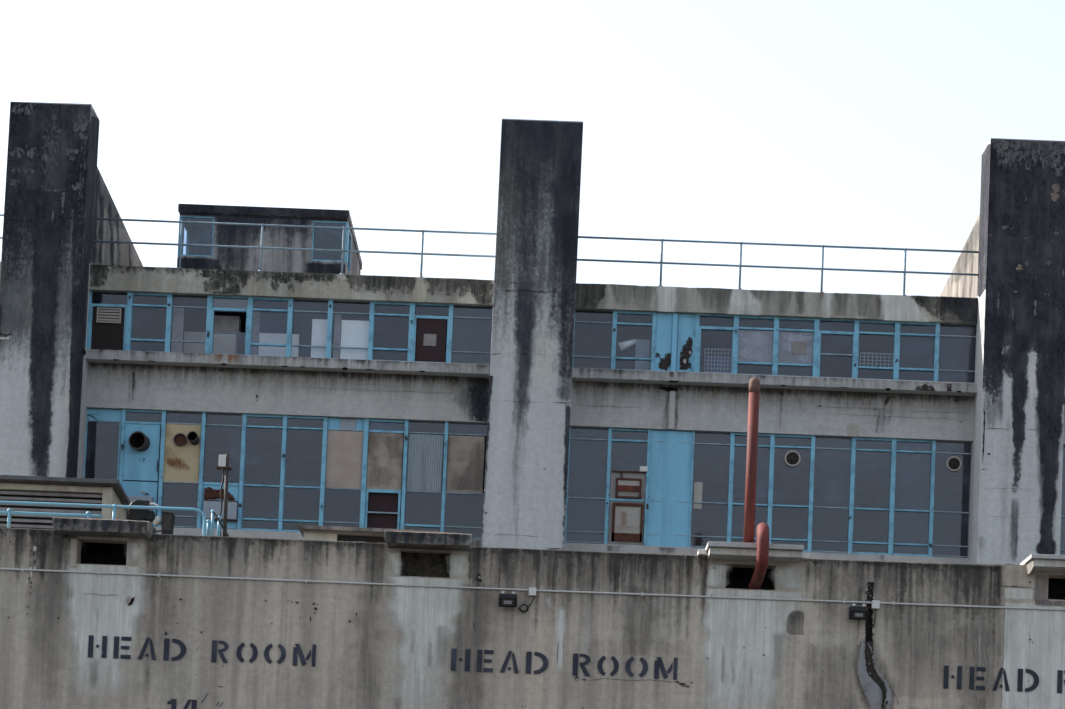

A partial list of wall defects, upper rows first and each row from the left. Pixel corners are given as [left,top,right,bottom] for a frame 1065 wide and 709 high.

water stain [0,102,804,709]
peeling [653,337,693,392]
water stain [824,293,846,317]
water stain [809,378,970,405]
water stain [866,139,1065,555]
crack [864,582,899,709]
water stain [808,559,1065,709]